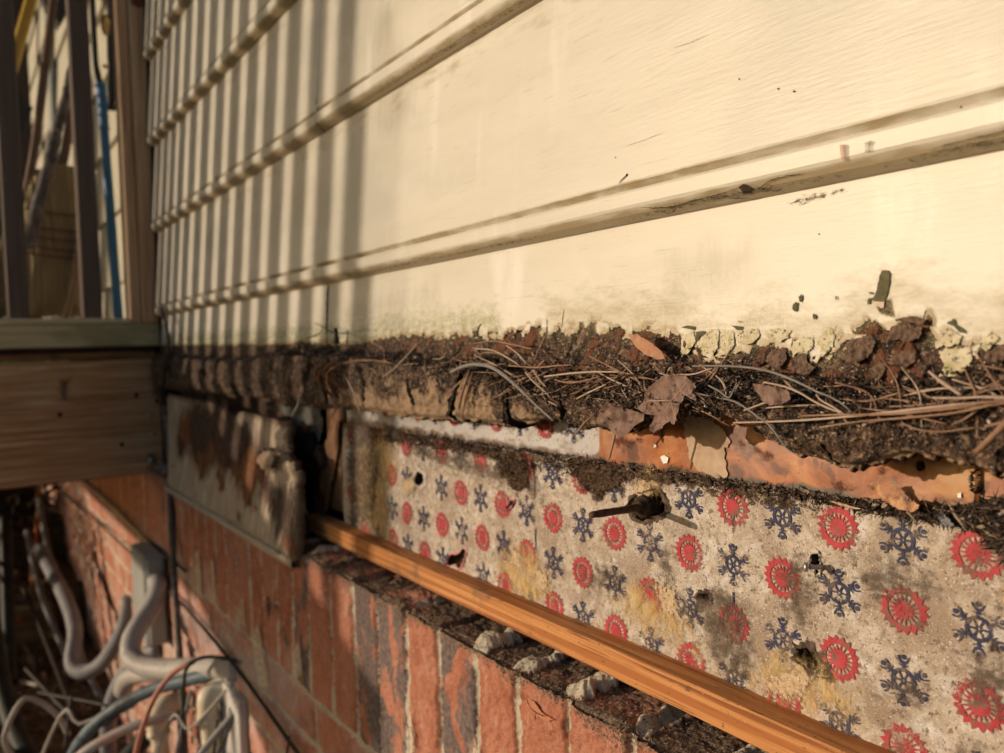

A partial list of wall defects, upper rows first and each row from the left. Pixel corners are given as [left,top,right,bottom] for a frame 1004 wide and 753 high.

peeling [680,314,835,377]
spalling [844,270,925,381]
peeling [939,318,1004,377]
leakage [174,393,301,562]
leakage [405,712,415,753]